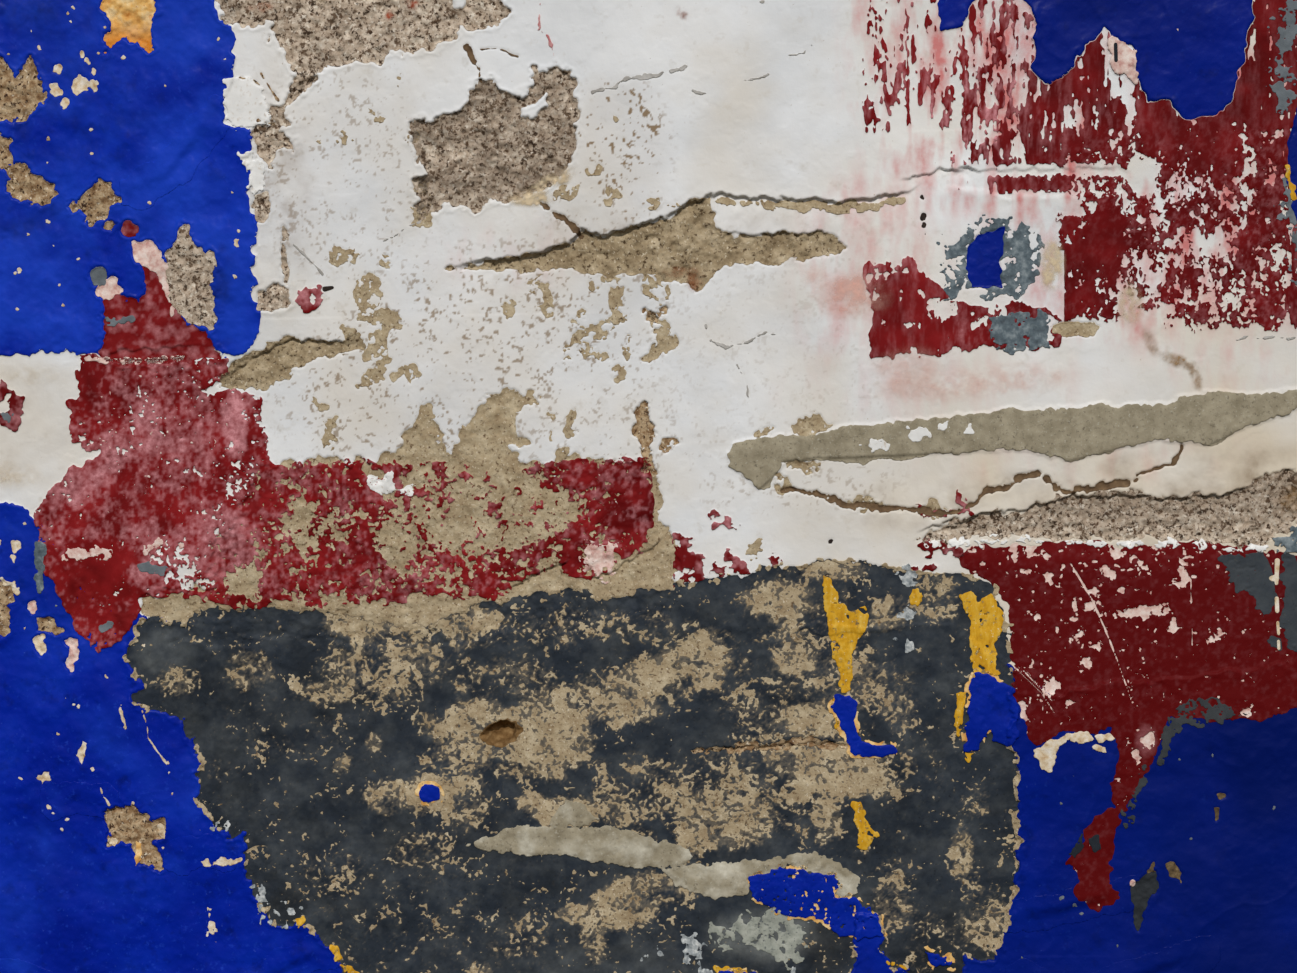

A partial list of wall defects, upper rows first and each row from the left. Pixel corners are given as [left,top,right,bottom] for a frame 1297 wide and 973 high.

peeling [0,0,156,224]
spalling [215,0,511,223]
spalling [405,65,623,228]
peeling [445,0,1297,383]
peeling [0,379,25,432]
peeling [0,577,20,637]
peeling [0,540,21,563]
peeling [27,601,65,656]
peeling [33,178,1297,973]
peeling [18,772,51,784]